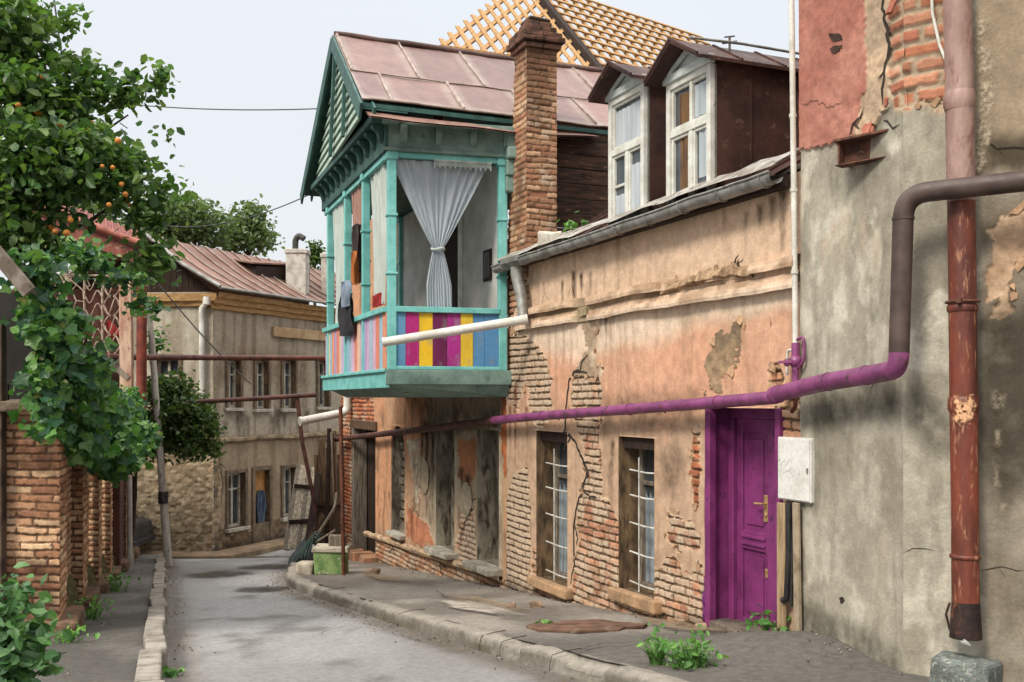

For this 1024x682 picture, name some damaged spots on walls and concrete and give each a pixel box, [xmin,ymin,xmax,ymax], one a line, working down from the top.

crack [802,0,899,135]
spalling [849,0,945,136]
flaking render [987,200,1024,319]
flaking render [702,315,746,396]
spalling [375,277,705,628]
crack [563,354,597,583]